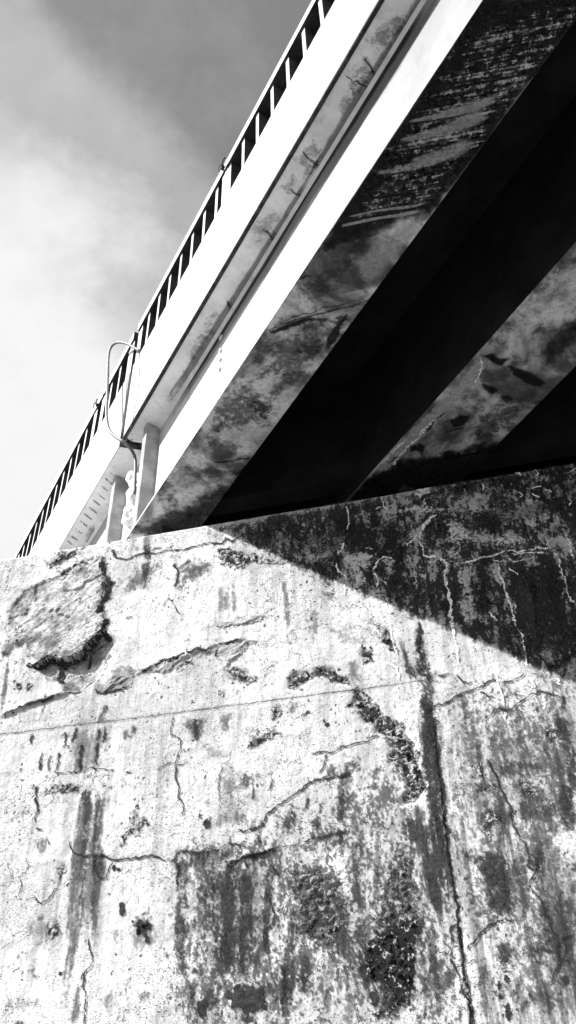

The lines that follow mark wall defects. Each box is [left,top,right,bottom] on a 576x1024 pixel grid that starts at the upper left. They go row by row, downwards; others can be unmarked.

leakage [184,23,415,392]
leakage [542,323,576,361]
leakage [140,473,240,588]
spalling [0,546,150,697]
spalling [229,667,258,685]
leakage [162,357,576,1024]
crack [34,766,131,830]
leakage [63,791,105,979]
crack [158,718,186,815]
crack [69,735,379,942]
crack [416,574,575,1024]